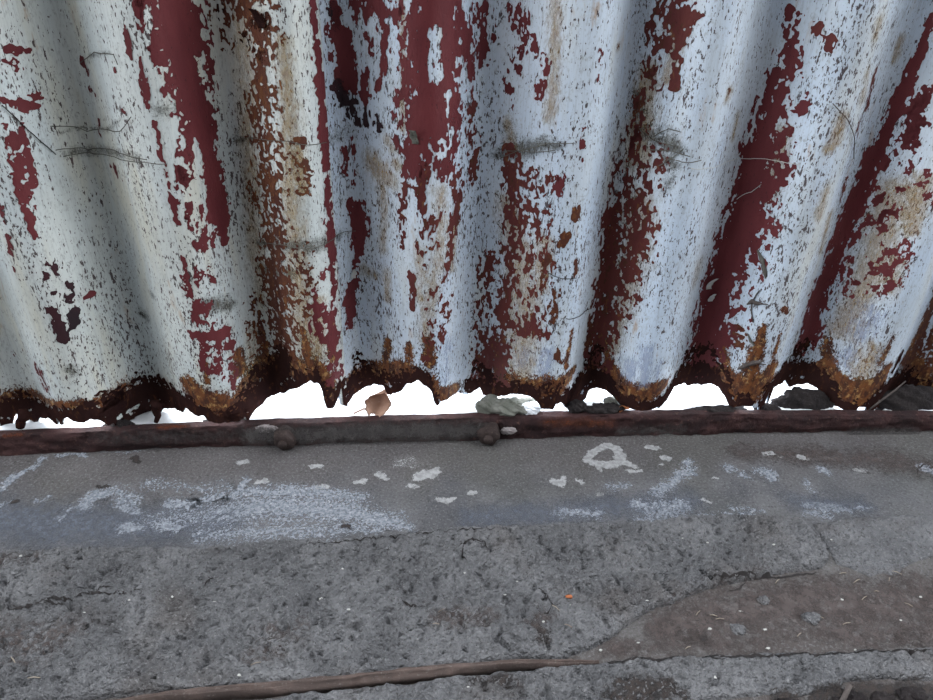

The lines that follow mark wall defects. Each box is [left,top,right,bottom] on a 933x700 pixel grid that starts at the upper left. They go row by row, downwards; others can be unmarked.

peeling [0,91,44,240]
peeling [43,260,97,345]
peeling [122,0,231,253]
peeling [179,255,239,391]
peeling [305,0,497,388]
rust [0,0,933,438]
peeling [468,142,581,390]
peeling [583,0,705,376]
peeling [684,3,838,377]
peeling [794,12,933,360]
crack [701,567,819,592]
crack [603,648,930,664]